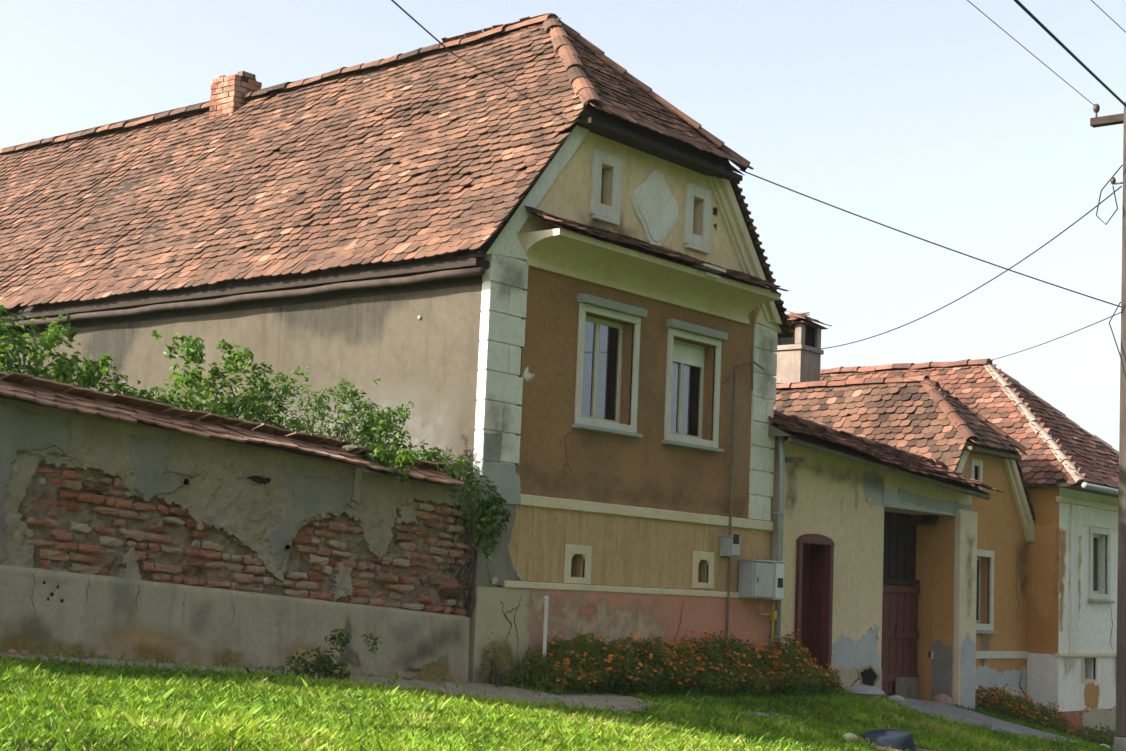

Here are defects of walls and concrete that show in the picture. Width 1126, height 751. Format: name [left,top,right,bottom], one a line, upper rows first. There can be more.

flaking render [0,402,475,616]
peeling [487,503,523,585]
crack [500,600,521,653]
peeling [831,624,881,687]